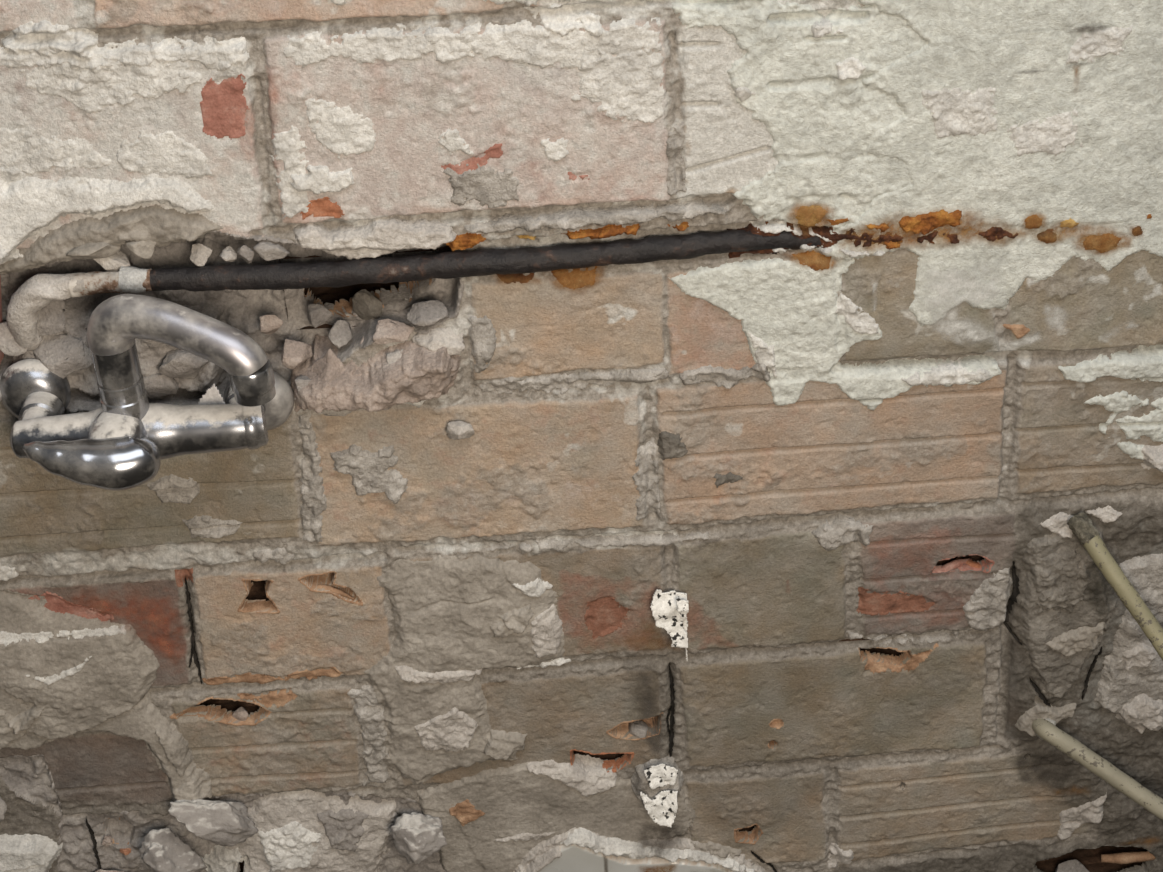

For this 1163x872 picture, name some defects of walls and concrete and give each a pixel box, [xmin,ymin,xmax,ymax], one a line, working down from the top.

flaking render [0,172,458,322]
flaking render [669,0,1163,411]
corrosion [727,205,1152,271]
spalling [120,277,464,401]
crack [185,578,203,685]
peeling [650,589,689,661]
crack [666,663,675,757]
crack [1003,561,1023,645]
crack [1029,677,1051,707]
crack [1081,647,1102,700]
spalling [0,754,248,872]
peeling [525,712,684,828]